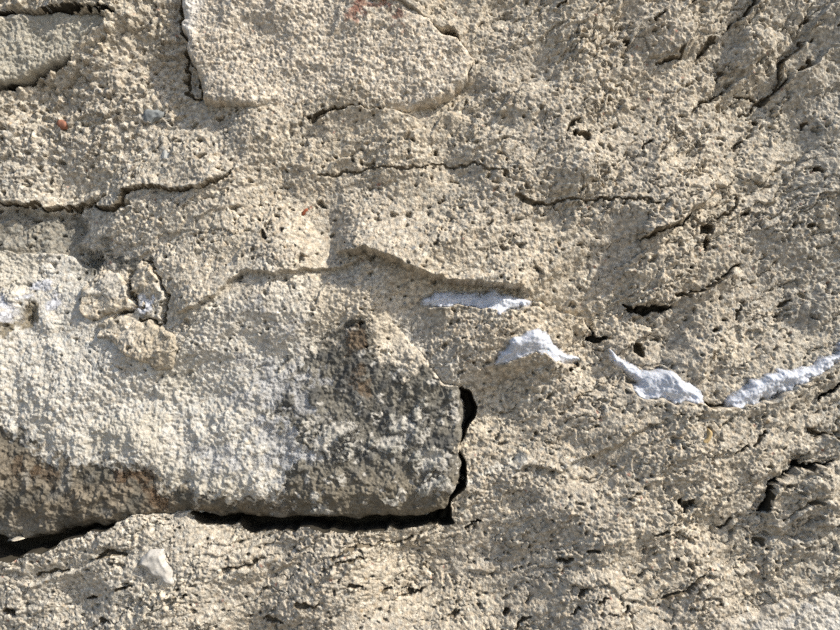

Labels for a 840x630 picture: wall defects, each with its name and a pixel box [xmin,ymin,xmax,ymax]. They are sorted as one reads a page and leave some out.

crack [178,0,204,101]
crack [655,0,759,66]
crack [691,16,814,118]
crack [307,102,383,124]
crack [0,167,234,214]
crack [317,160,662,206]
crack [639,210,693,241]
crack [622,263,740,317]
crack [735,430,768,454]
crack [190,387,482,597]
crack [756,459,832,522]
crack [0,524,128,576]